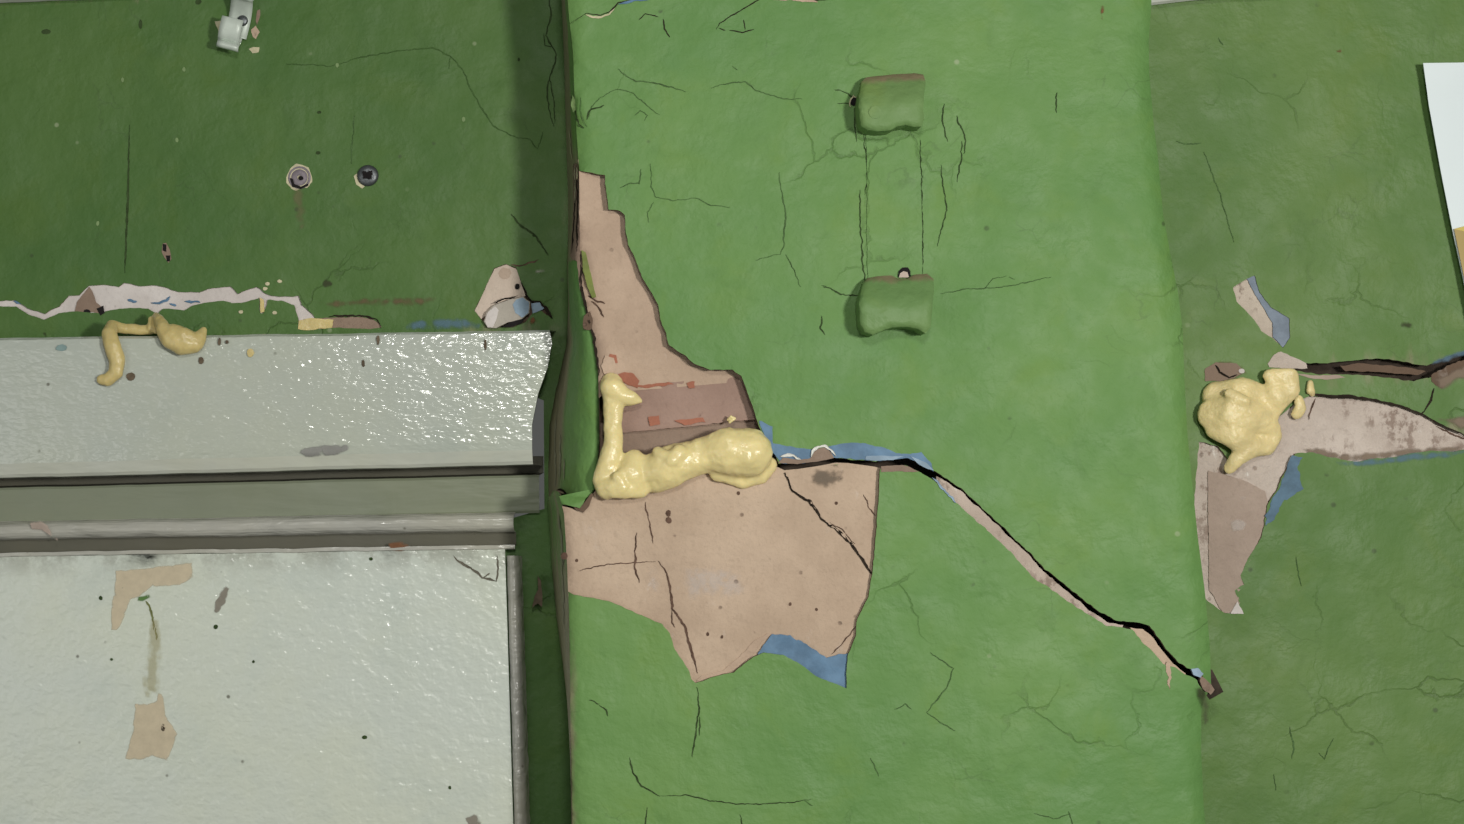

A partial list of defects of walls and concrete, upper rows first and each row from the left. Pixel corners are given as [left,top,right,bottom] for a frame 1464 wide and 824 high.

crack [718,0,819,33]
peeling [0,279,381,345]
flaking render [474,260,553,350]
flaking render [569,95,760,455]
spalling [1233,276,1307,369]
flaking render [1205,362,1245,381]
crack [1295,351,1464,415]
flaking render [1194,393,1464,614]
peeling [111,563,192,630]
flaking render [561,463,881,688]
crack [759,421,1223,731]
peeling [126,694,177,759]